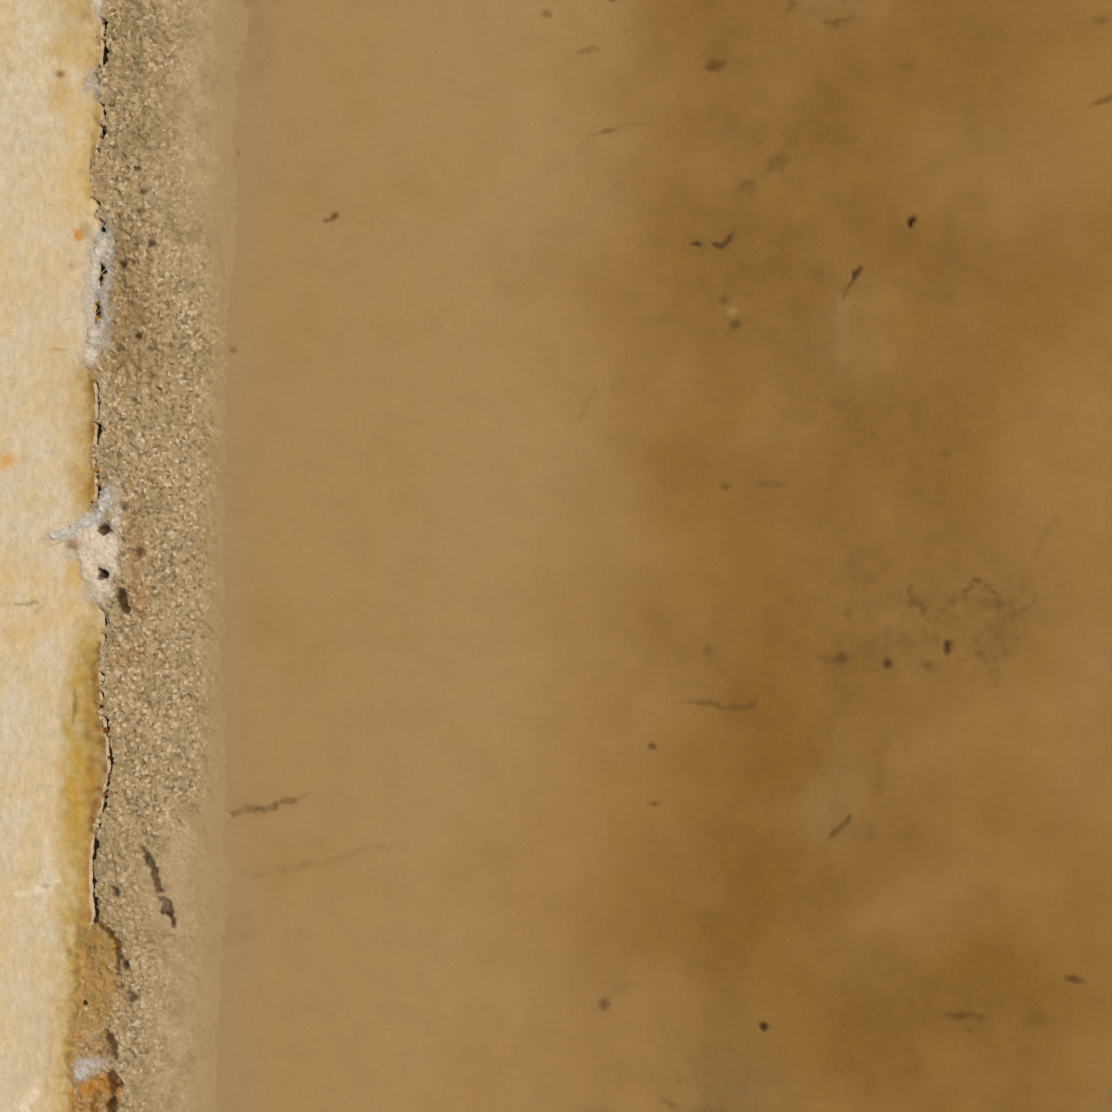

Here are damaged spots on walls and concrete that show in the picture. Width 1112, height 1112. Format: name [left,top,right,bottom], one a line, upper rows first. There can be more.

crack [96,17,110,153]
spalling [105,0,171,166]
crack [1054,92,1112,115]
leakage [4,0,101,522]
crack [94,202,108,325]
crack [89,383,104,504]
crack [671,695,762,726]
leakage [0,547,108,1112]
crack [92,673,114,923]
crack [221,790,323,833]
spalling [73,828,139,1104]
rust [72,1028,132,1112]